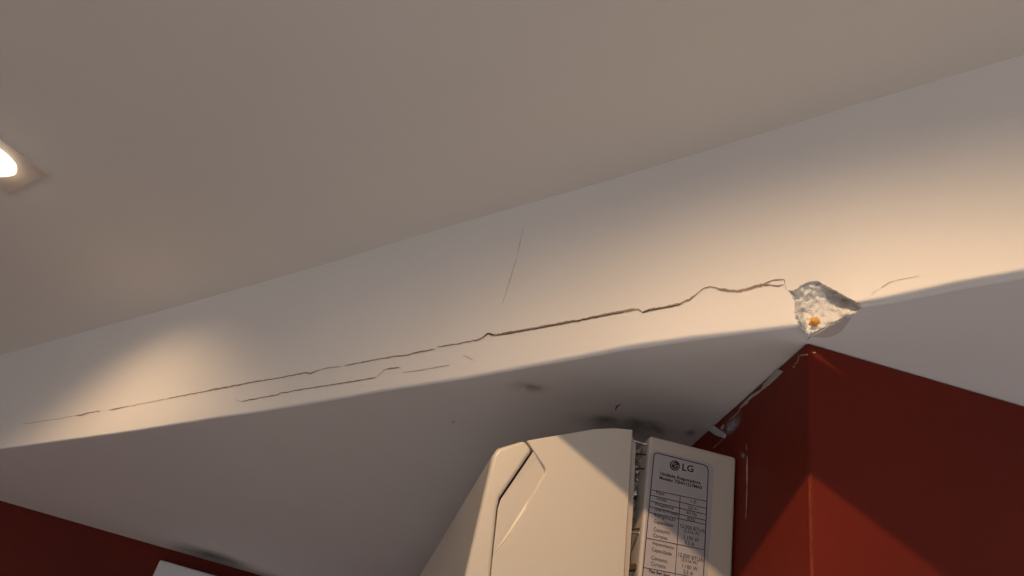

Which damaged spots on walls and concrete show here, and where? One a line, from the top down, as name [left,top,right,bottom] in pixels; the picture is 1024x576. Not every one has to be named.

crack [24,279,787,424]
flaking render [787,281,861,340]